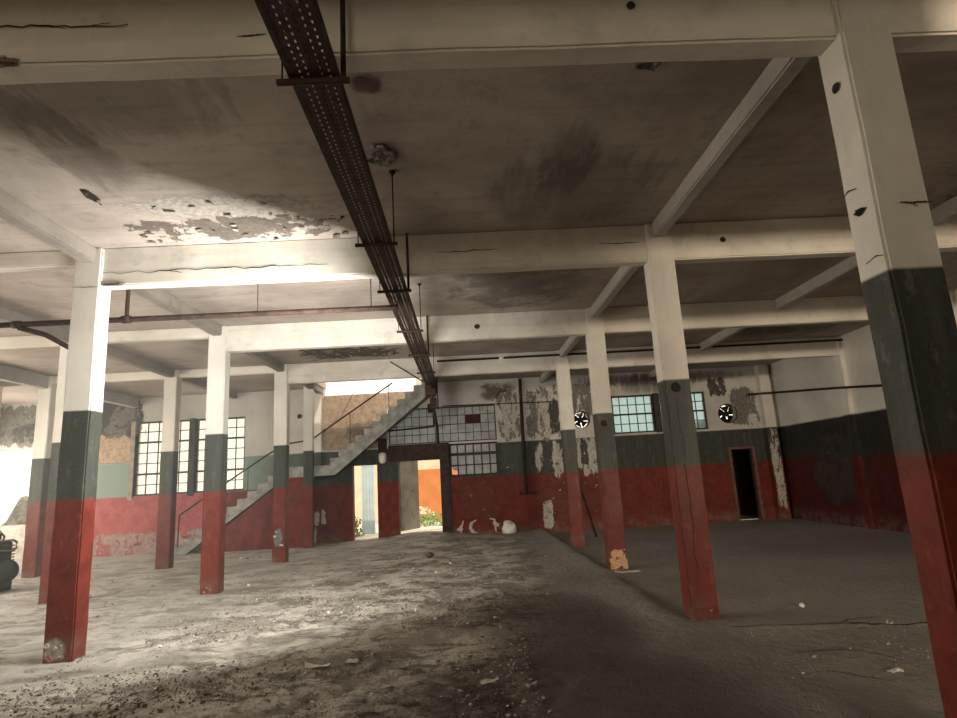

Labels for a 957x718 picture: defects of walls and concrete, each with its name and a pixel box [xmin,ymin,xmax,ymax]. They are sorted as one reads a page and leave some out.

crack [0,21,128,29]
crack [82,264,323,288]
peeling [572,382,607,426]
peeling [707,377,760,426]
peeling [0,405,37,449]
peeling [98,401,147,464]
peeling [496,385,567,528]
peeling [576,436,598,488]
peeling [770,429,788,509]
spalling [610,549,629,570]
spalling [43,640,64,662]